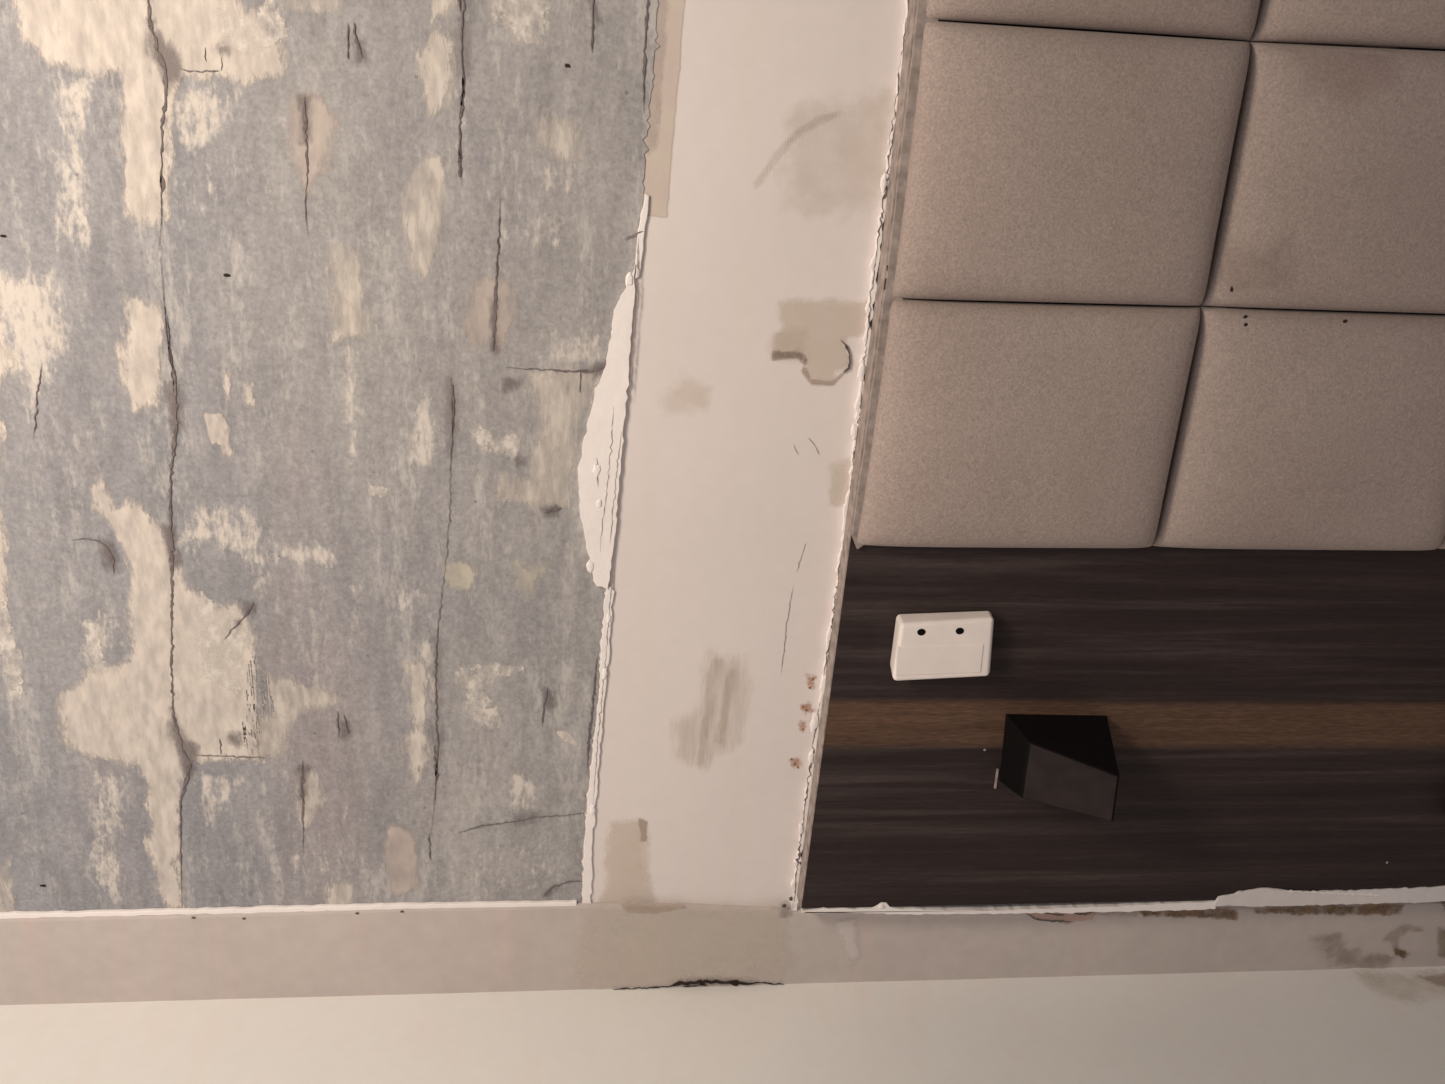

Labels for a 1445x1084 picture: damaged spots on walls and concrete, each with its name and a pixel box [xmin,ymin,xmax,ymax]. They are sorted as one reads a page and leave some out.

peeling [625,194,649,286]
peeling [790,0,909,911]
crack [613,980,784,990]